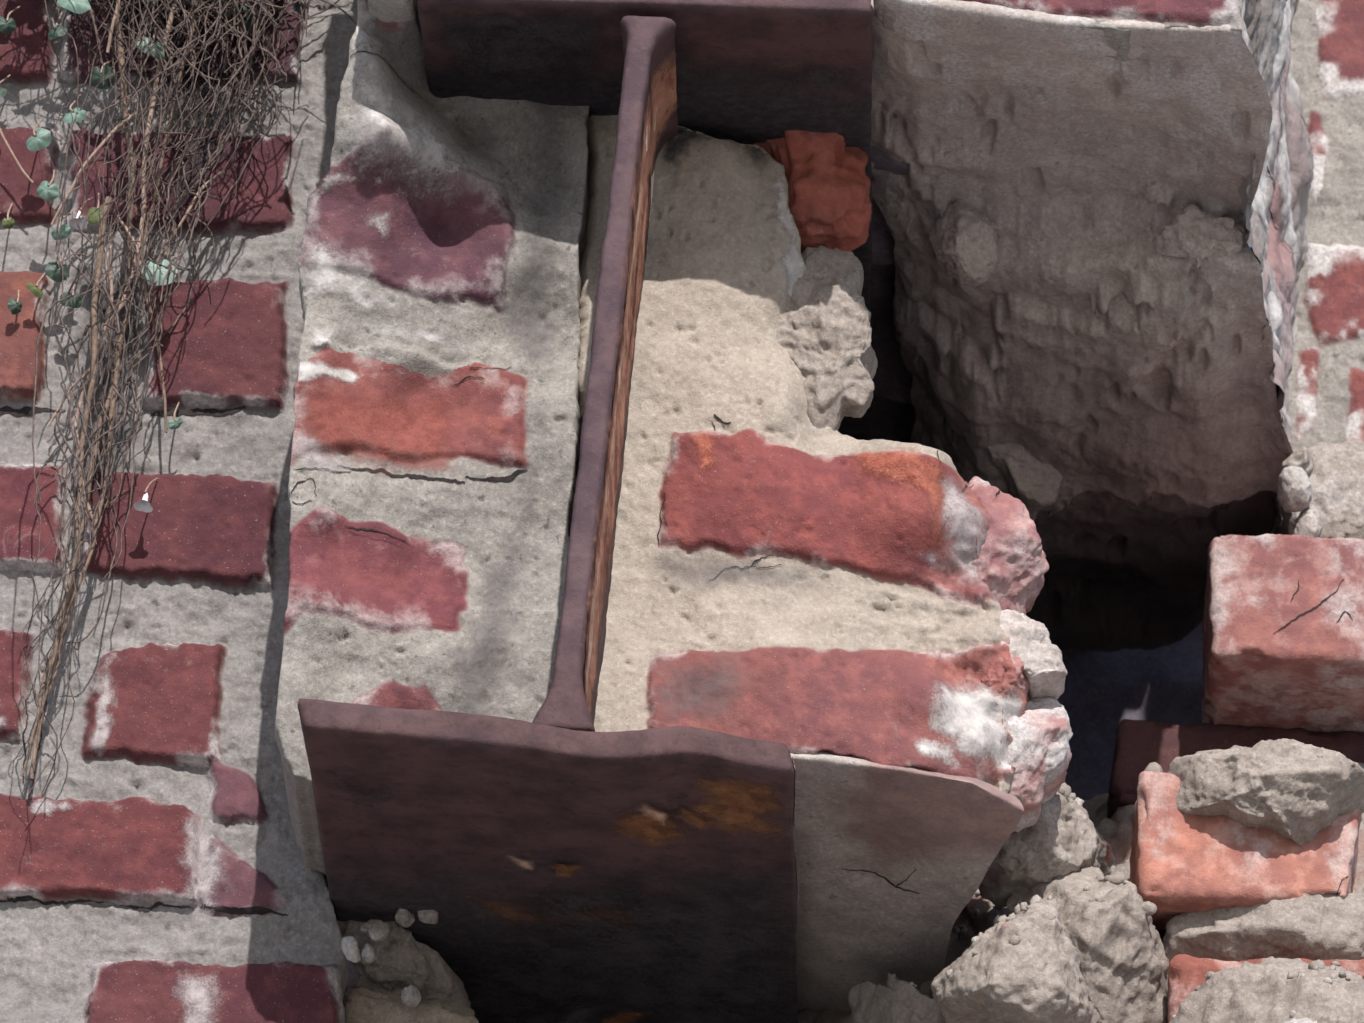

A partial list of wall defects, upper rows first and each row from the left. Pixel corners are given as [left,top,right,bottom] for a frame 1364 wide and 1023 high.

spalling [753,130,872,254]
flaking render [1267,277,1284,359]
crack [0,406,66,416]
crack [150,406,245,416]
corrosion [585,65,677,713]
spalling [855,451,943,539]
crack [1275,578,1353,633]
water stain [917,686,1022,775]
spalling [1107,534,1364,941]
corrosion [618,780,779,844]
crack [0,895,288,916]
spalling [1167,954,1267,1023]